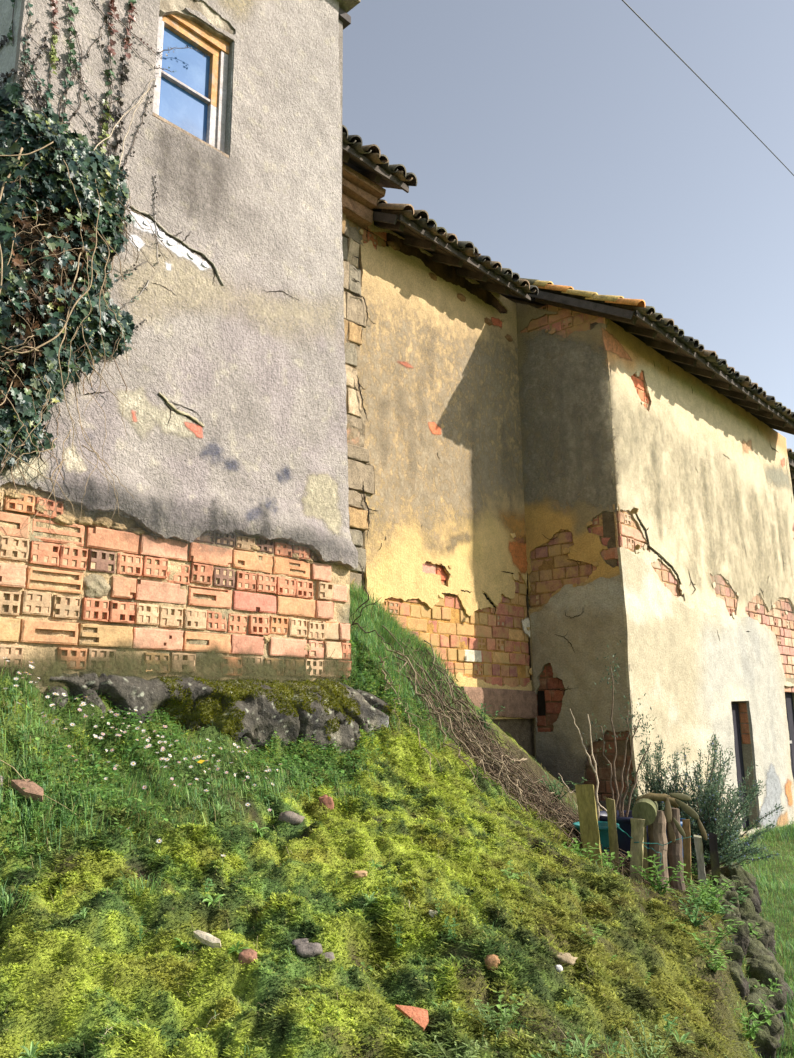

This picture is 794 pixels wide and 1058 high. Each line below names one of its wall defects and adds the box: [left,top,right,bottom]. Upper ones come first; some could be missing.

crack [129,204,225,286]
damp [204,445,237,469]
spalling [0,205,649,694]
crack [634,507,696,600]
spalling [382,504,684,732]
spalling [710,574,794,693]
spalling [584,726,646,801]